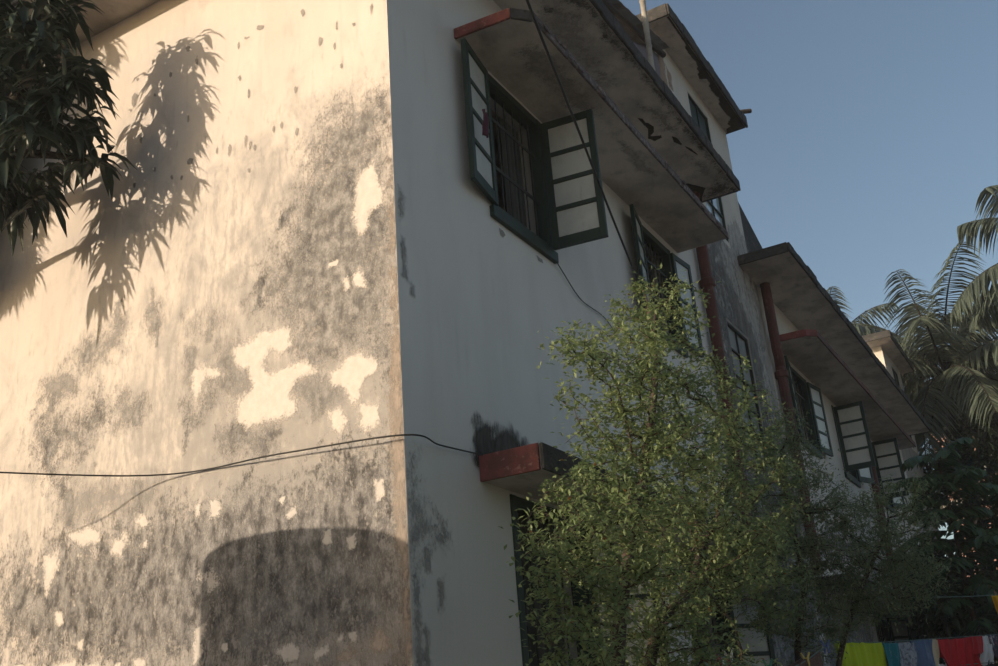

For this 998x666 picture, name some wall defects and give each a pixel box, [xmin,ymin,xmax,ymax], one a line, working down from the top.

water stain [538,0,745,198]
crack [638,118,697,155]
water stain [250,91,415,382]
peeling [351,159,396,251]
peeling [190,362,220,405]
water stain [0,302,446,666]
peeling [232,267,412,666]
water stain [473,416,527,468]
water stain [708,240,873,666]
peeling [42,548,60,599]
peeling [66,513,151,561]
peeling [191,622,207,665]